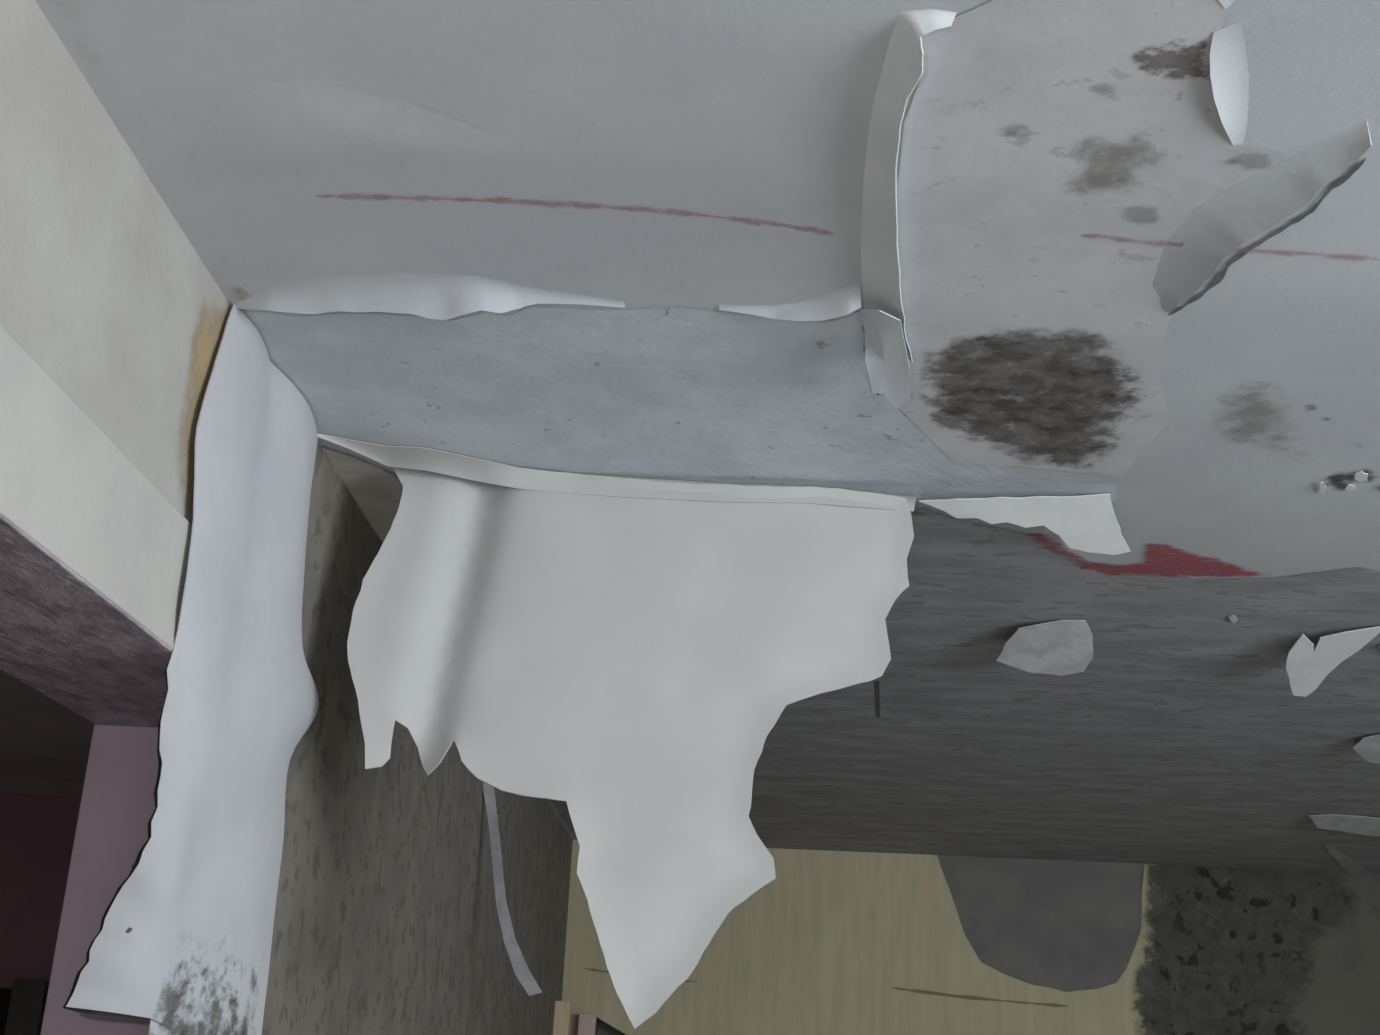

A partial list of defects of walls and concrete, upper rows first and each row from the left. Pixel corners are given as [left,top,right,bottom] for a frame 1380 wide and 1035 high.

damp [1134,42,1208,78]
peeling [231,0,1372,507]
damp [929,332,1139,465]
peeling [262,442,575,1035]
peeling [749,508,1380,992]
damp [150,965,248,1035]
damp [1135,864,1380,1035]